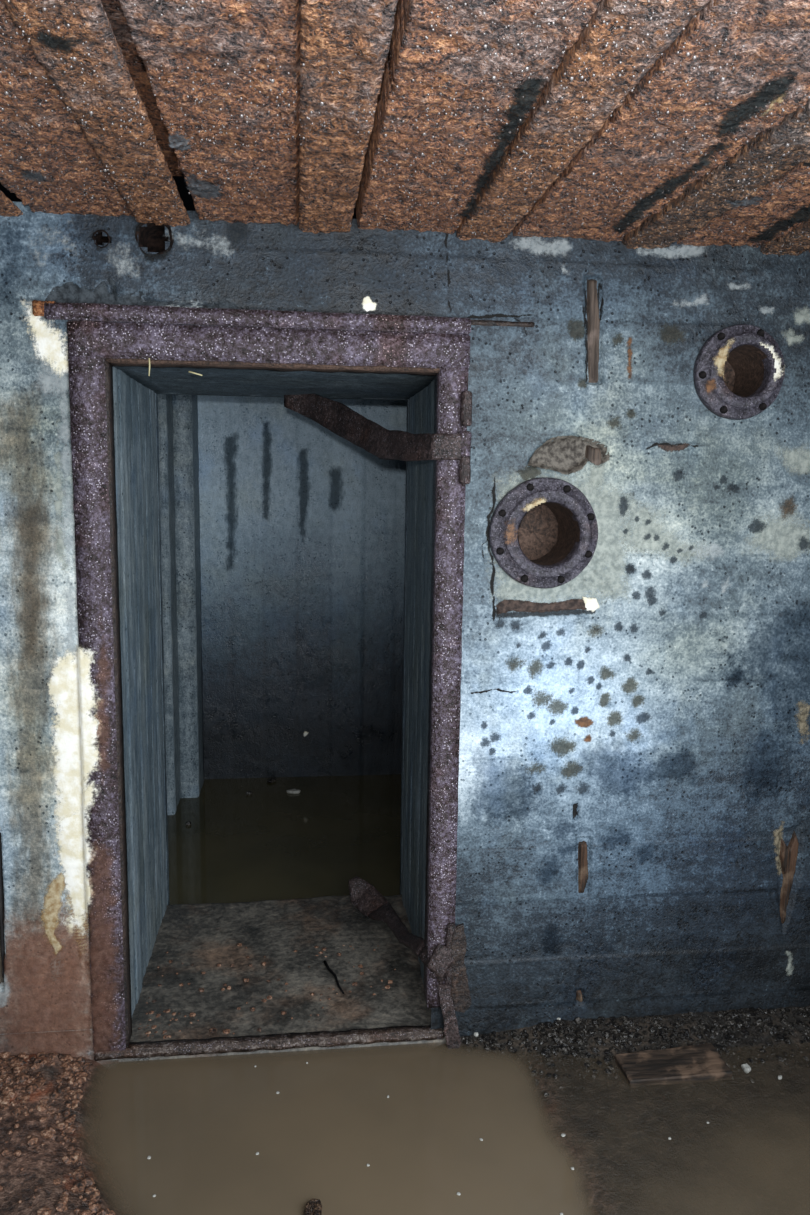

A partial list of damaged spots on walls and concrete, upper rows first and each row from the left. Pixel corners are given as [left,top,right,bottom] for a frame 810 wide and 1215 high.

spalling [22,277,240,378]
damp [714,475,739,493]
damp [779,449,810,473]
damp [619,496,700,616]
damp [748,514,810,558]
corrosion [495,597,600,618]
peeling [48,646,102,957]
damp [472,721,547,824]
damp [495,619,695,796]
damp [727,607,810,803]
corrosion [774,822,783,875]
corrosion [796,702,810,743]